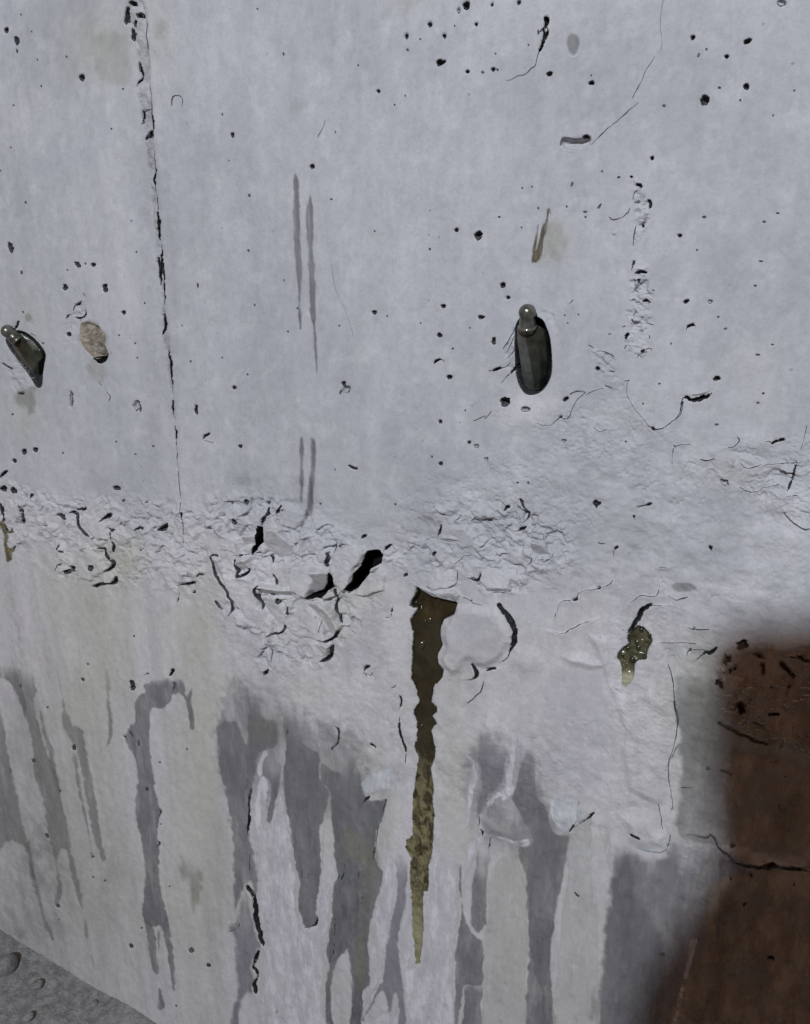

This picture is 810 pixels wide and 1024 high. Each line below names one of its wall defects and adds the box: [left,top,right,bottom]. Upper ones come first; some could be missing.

crack [506,16,549,81]
crack [538,388,712,455]
spalling [251,526,264,555]
spalling [305,550,383,599]
crack [648,627,808,872]
water stain [126,681,194,986]
water stain [217,588,810,1024]